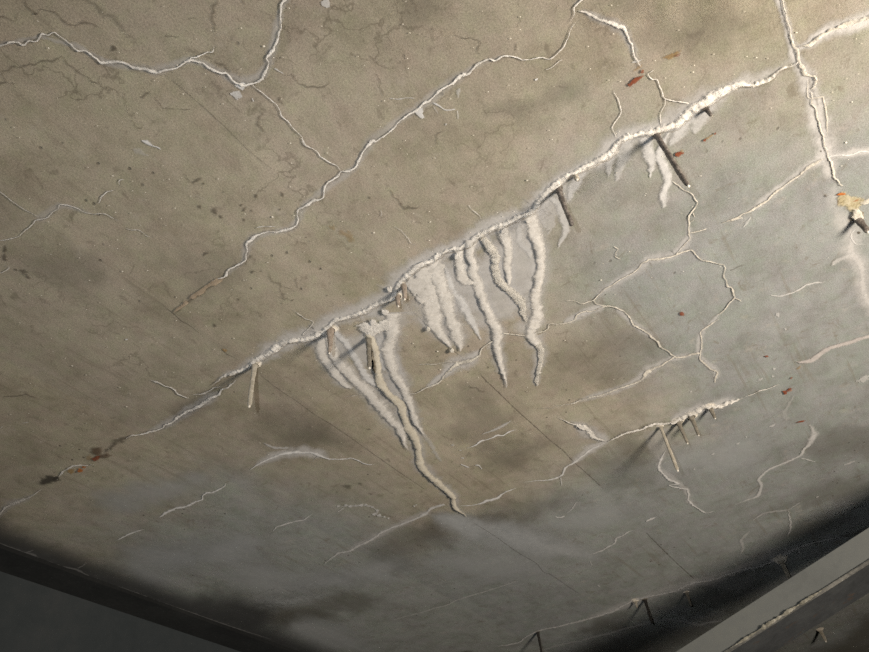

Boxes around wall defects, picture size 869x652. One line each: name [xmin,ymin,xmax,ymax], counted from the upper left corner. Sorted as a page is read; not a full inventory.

crack [0,0,642,312]
crack [108,0,869,561]
crack [498,512,832,647]